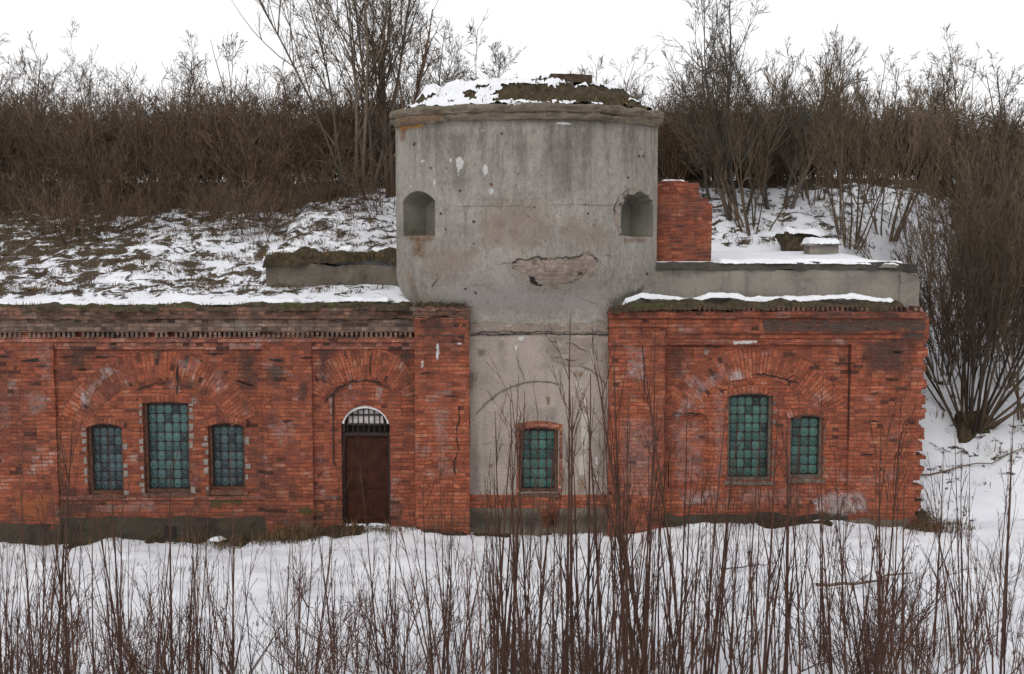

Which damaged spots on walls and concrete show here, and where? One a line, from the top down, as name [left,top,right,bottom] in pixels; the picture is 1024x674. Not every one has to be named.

spalling [497,251,610,290]
crack [754,373,800,383]
crack [419,332,608,475]